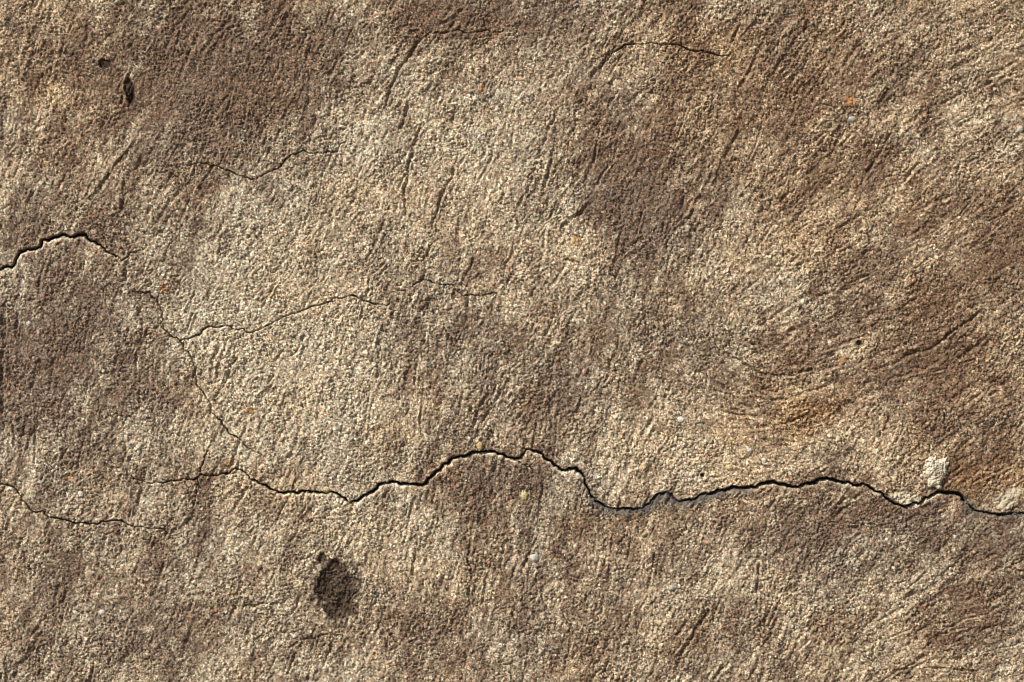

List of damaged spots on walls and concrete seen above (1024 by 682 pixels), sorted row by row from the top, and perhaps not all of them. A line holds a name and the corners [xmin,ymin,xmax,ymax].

crack [0,233,139,270]
crack [142,292,1024,516]
crack [2,484,171,534]